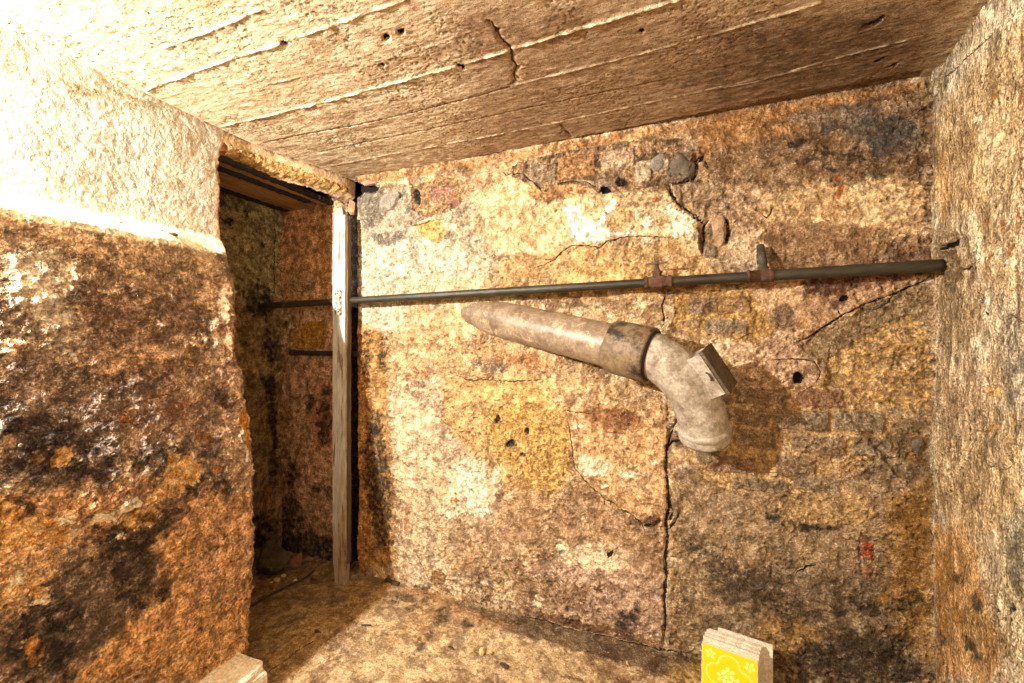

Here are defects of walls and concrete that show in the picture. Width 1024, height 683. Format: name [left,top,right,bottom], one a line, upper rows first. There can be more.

crack [264,20,659,152]
spalling [512,138,735,259]
crack [538,156,730,267]
damp [806,117,916,242]
damp [1,241,133,362]
crack [769,279,925,389]
damp [0,412,116,518]
damp [130,438,188,472]
damp [215,395,234,410]
damp [57,476,228,609]
crack [522,410,687,653]
damp [0,594,85,683]